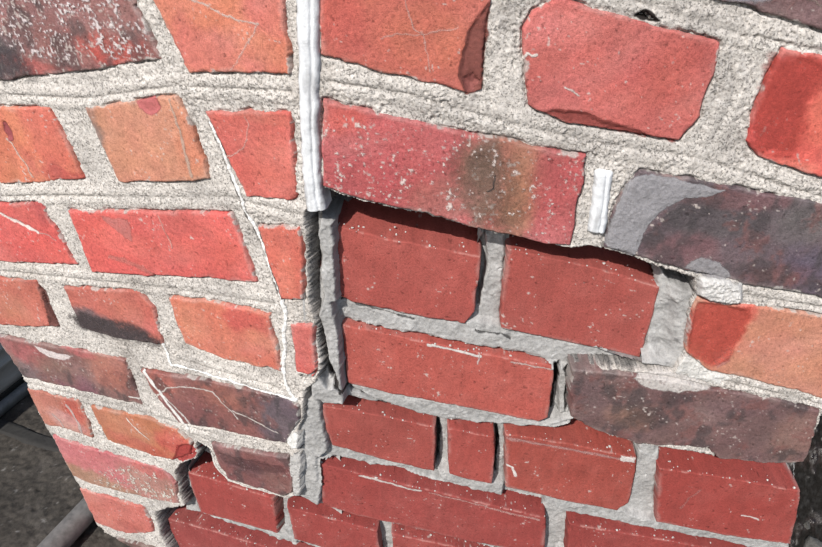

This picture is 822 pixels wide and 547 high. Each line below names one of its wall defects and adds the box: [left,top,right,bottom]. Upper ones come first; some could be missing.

crack [156,121,363,435]